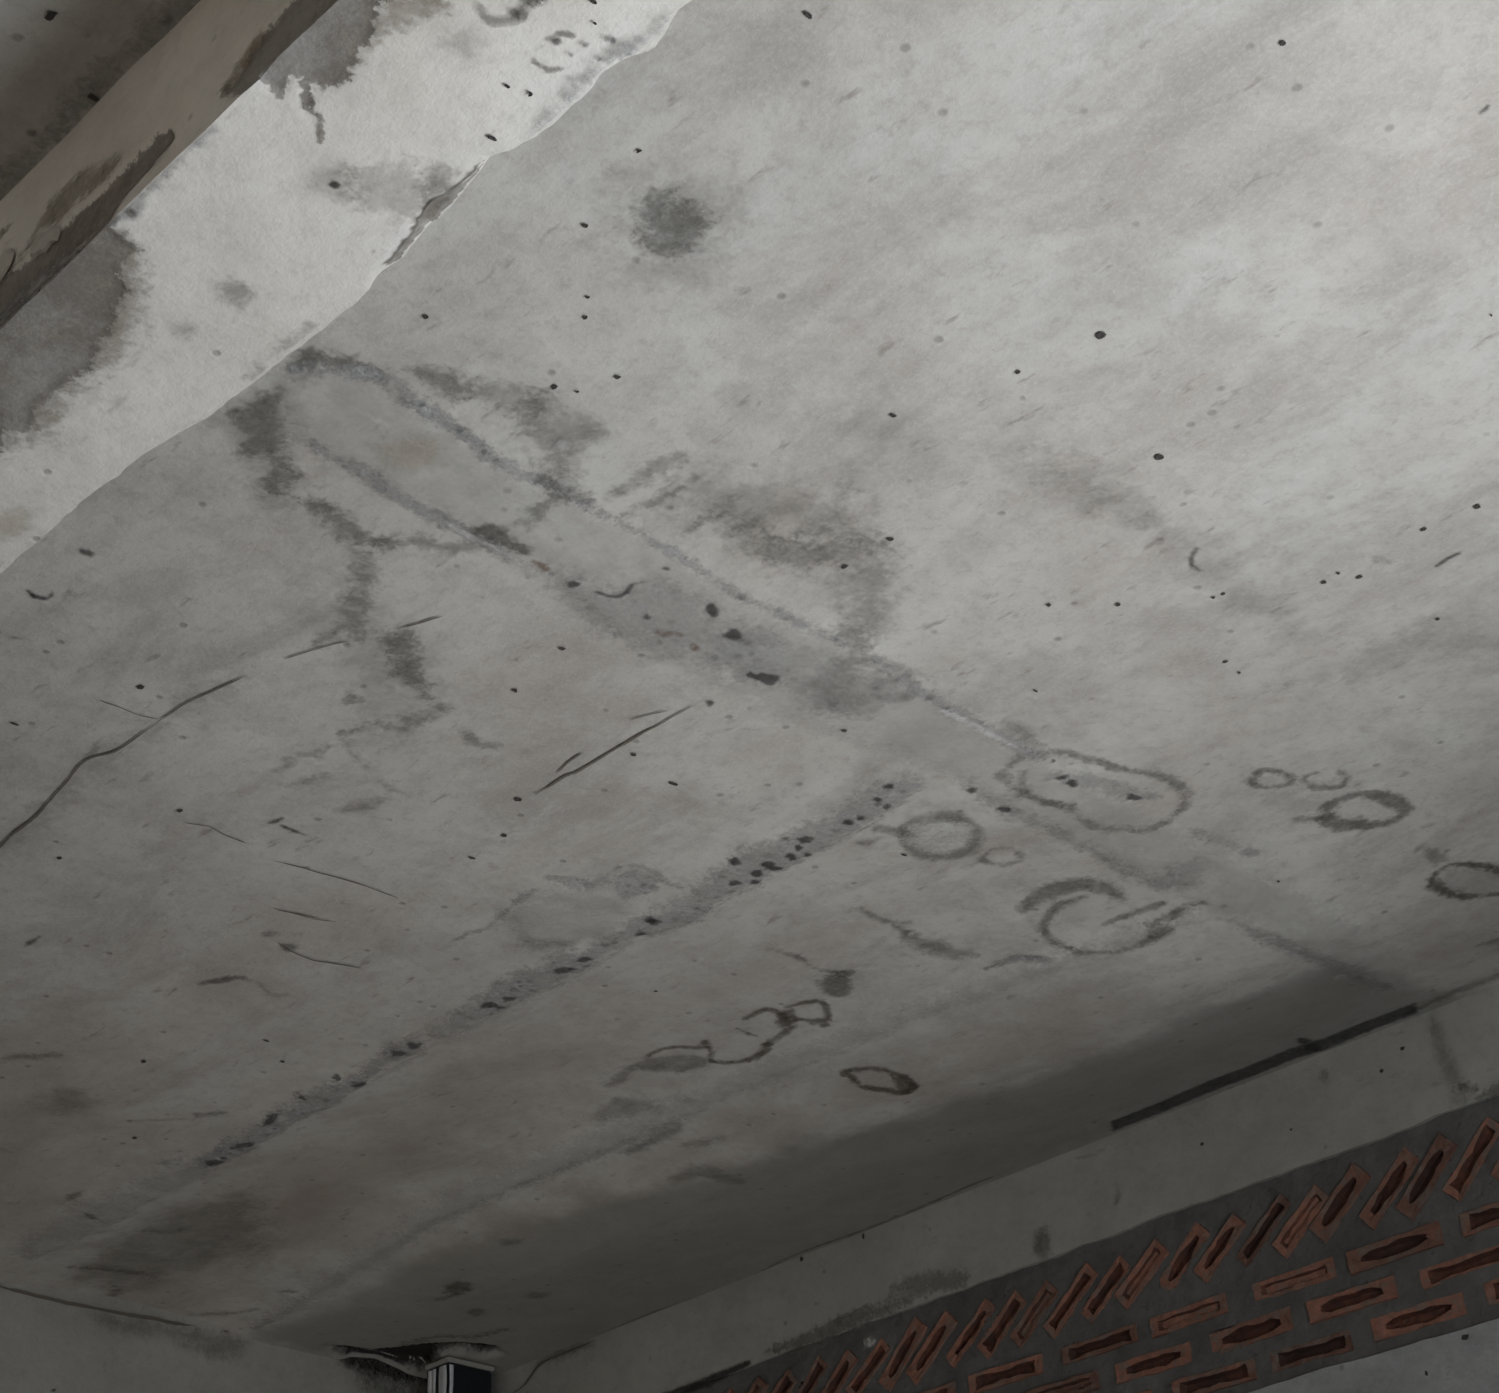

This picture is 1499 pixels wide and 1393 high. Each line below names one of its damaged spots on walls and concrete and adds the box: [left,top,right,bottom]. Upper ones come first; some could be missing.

peeling [220,0,442,144]
spalling [386,160,485,266]
peeling [0,129,174,453]
damp [474,525,528,554]
crack [400,616,441,628]
crack [285,641,347,659]
crack [0,676,245,848]
damp [1321,792,1405,829]
damp [913,815,970,853]
damp [1427,862,1499,899]
damp [649,973,847,1064]
damp [841,1067,917,1095]